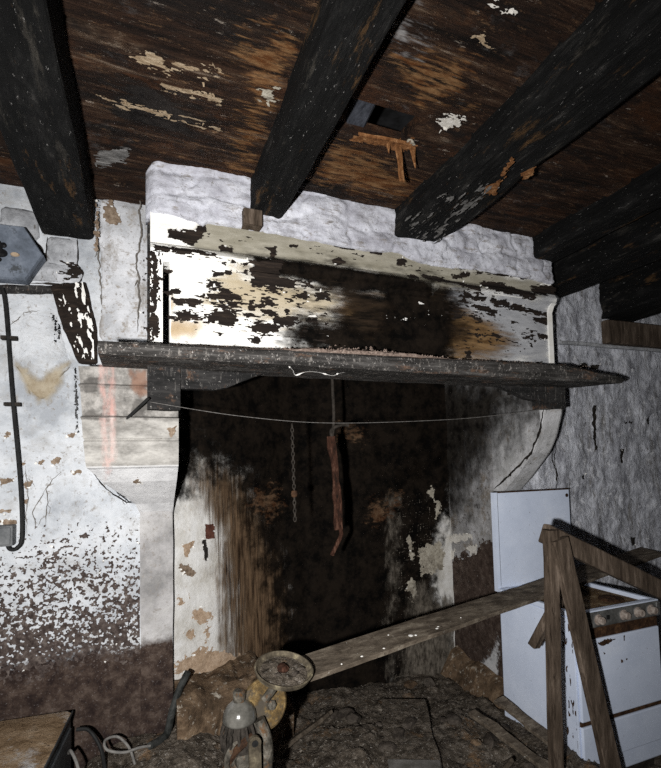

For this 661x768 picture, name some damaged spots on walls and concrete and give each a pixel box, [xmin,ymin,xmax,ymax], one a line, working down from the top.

peeling [129,50,225,106]
peeling [94,147,132,168]
peeling [96,94,221,133]
peeling [435,113,467,133]
peeling [139,225,338,345]
peeling [391,256,556,364]
damp [17,363,99,400]
crack [494,409,558,489]
peeling [0,518,140,686]
peeling [405,533,498,606]
spalling [173,606,240,676]
peeling [455,614,503,678]